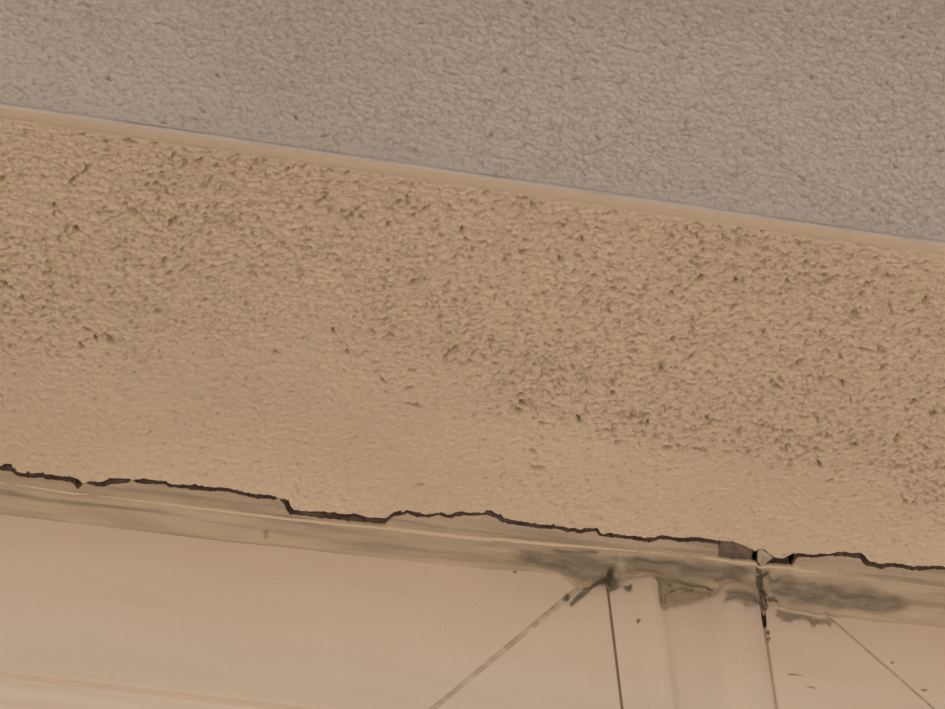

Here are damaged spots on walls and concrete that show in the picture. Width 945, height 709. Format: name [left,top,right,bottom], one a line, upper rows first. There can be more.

crack [0,464,719,548]
spalling [718,540,789,566]
damp [631,559,758,603]
damp [770,579,901,610]
damp [778,611,830,626]